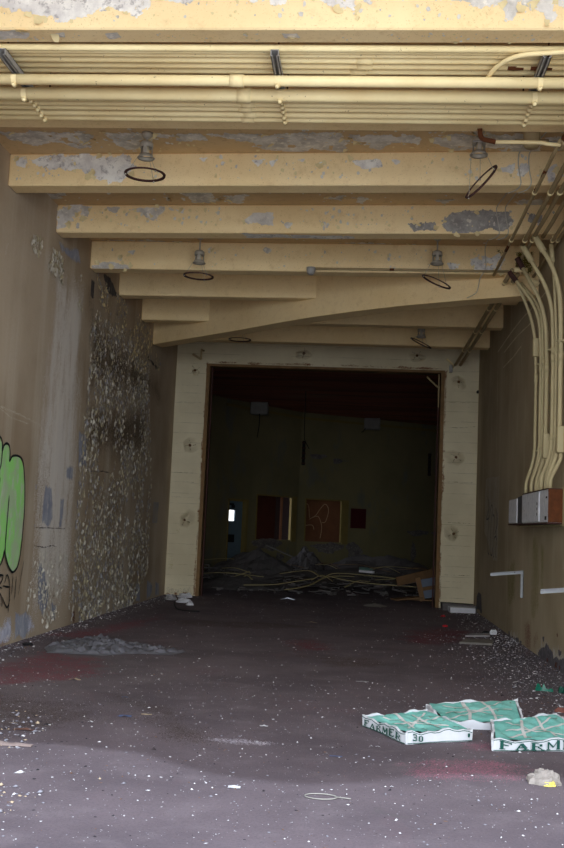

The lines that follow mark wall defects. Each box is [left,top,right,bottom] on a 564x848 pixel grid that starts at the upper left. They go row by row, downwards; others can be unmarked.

peeling [0,0,216,42]
peeling [297,0,391,21]
peeling [416,0,564,26]
peeling [0,128,564,195]
peeling [48,193,250,229]
peeling [405,193,515,276]
peeling [0,235,181,644]